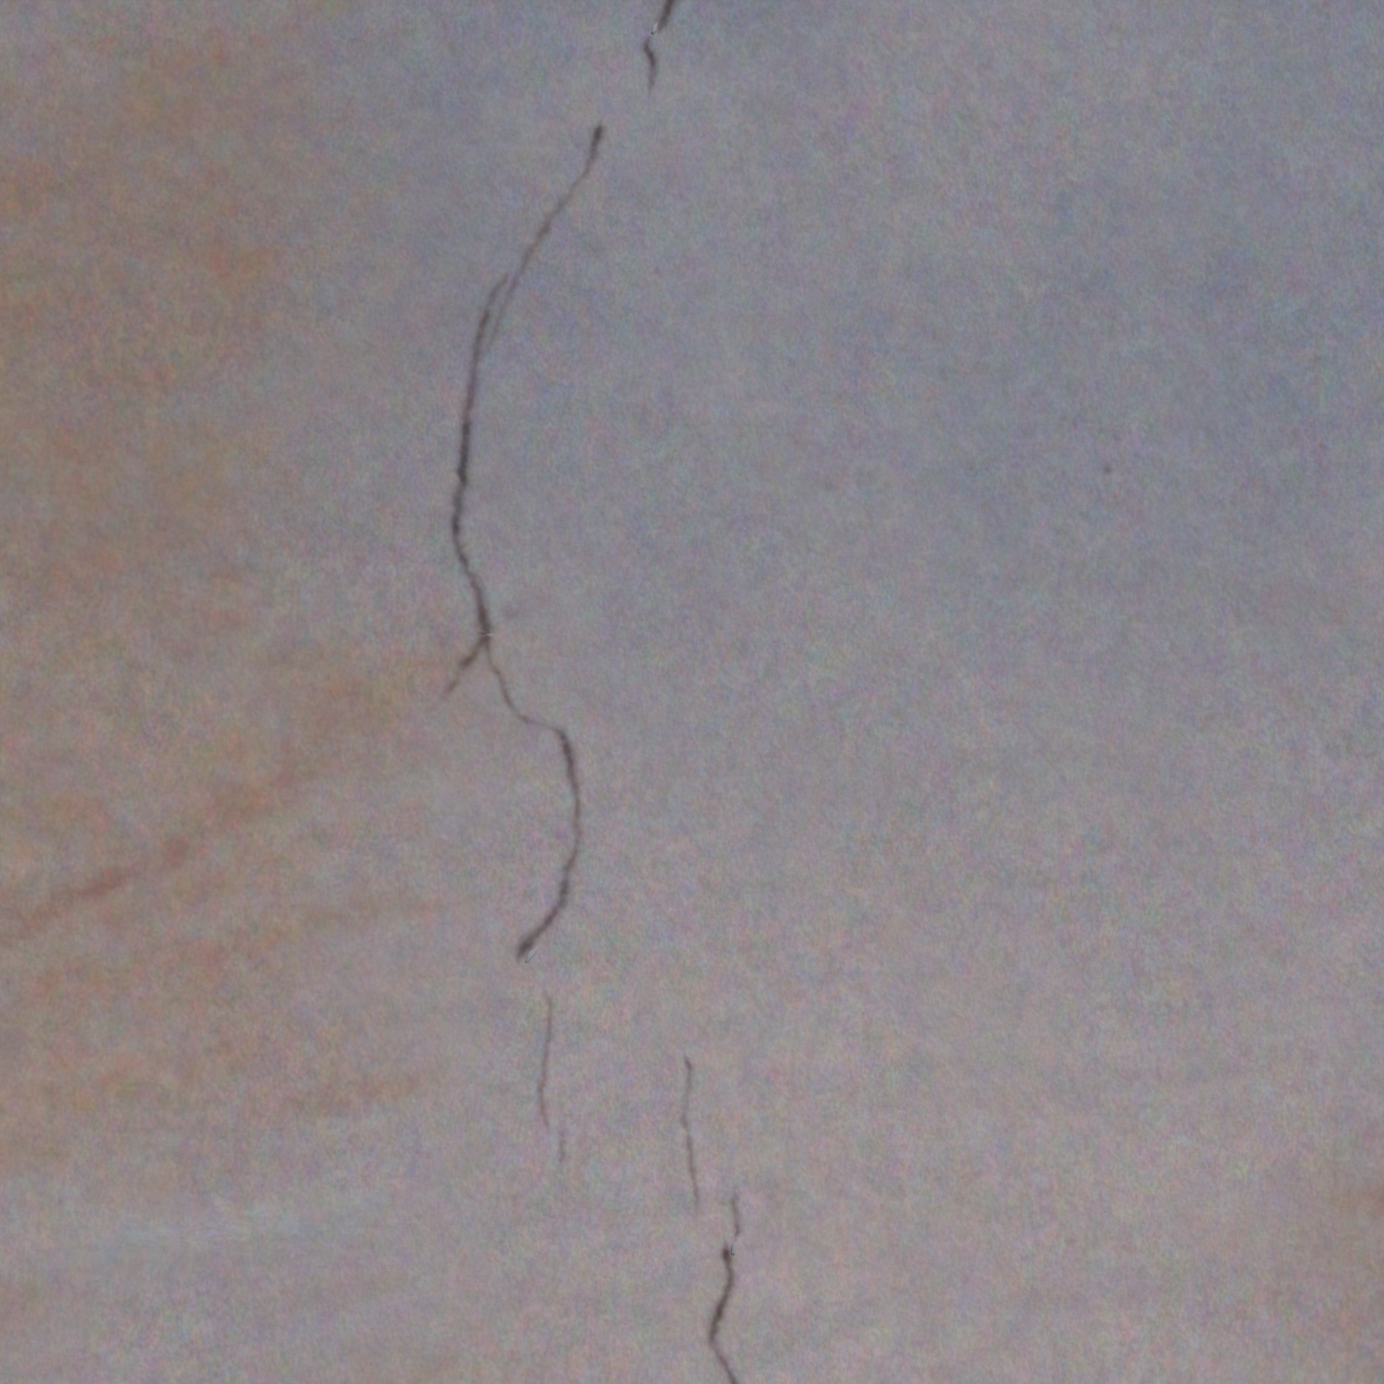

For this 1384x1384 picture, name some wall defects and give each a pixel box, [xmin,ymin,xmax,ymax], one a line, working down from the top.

crack [646,0,673,61]
crack [459,424,469,483]
crack [466,608,488,661]
crack [521,886,565,963]
crack [723,1241,737,1263]
crack [715,1300,724,1320]